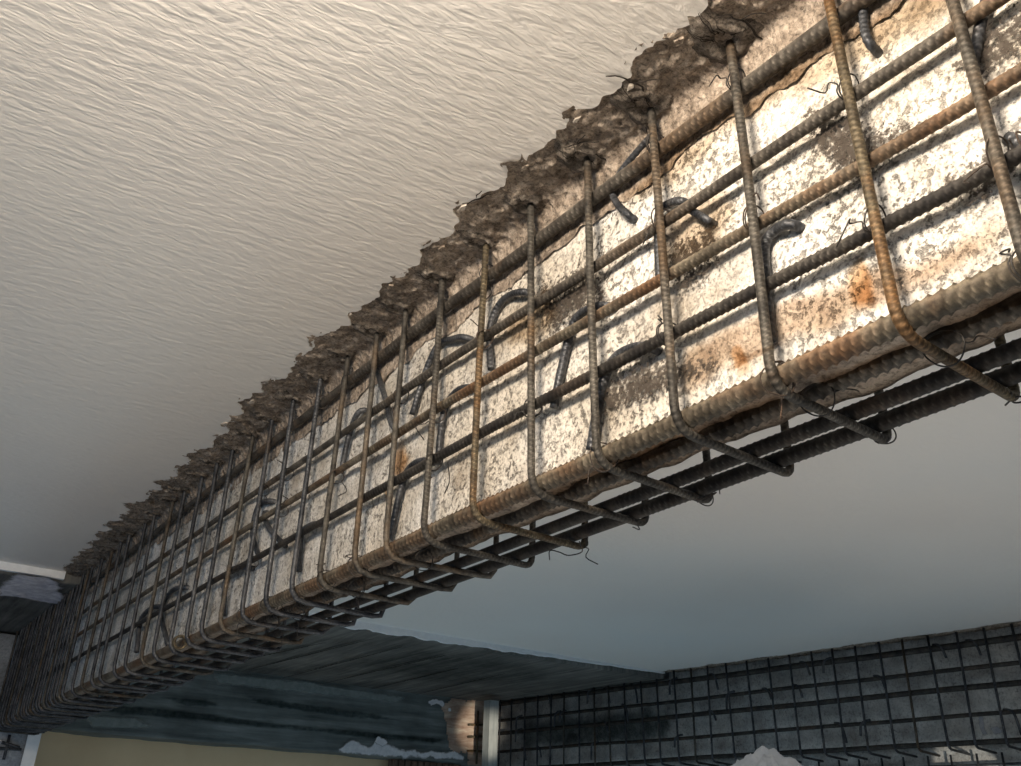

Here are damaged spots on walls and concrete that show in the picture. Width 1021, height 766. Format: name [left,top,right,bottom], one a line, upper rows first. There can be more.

spalling [979,2,1021,80]
spalling [808,111,911,171]
spalling [943,155,990,185]
spalling [949,177,997,206]
spalling [666,214,730,297]
spalling [535,259,610,336]
spalling [602,351,718,417]
peeling [0,575,63,604]
spalling [339,698,484,766]